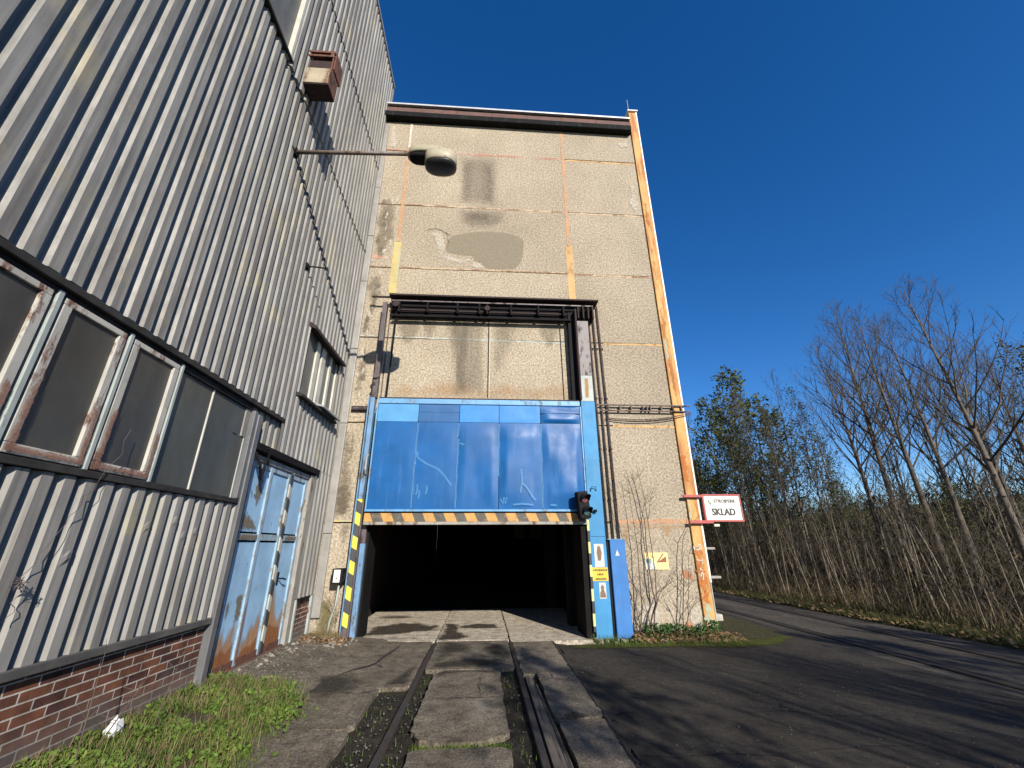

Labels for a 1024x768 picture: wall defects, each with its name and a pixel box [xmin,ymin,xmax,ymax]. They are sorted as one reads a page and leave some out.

spalling [431,231,483,269]
corrosion [210,594,282,670]